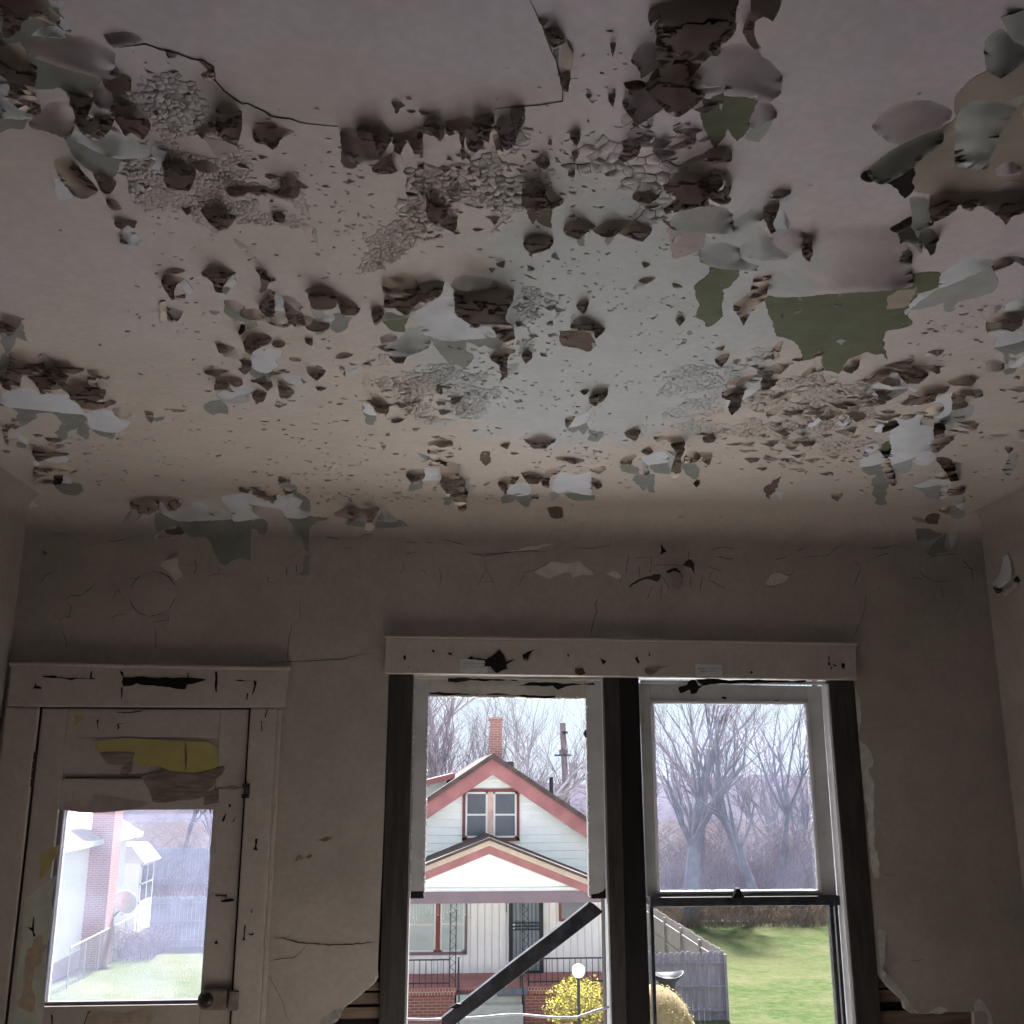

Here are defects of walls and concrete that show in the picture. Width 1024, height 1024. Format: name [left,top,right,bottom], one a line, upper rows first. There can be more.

crack [103,32,338,127]
crack [497,1,573,109]
peeling [0,0,1024,575]
flaking render [533,544,695,599]
peeling [991,553,1020,596]
peeling [122,676,206,689]
spalling [430,649,595,699]
peeling [63,738,242,813]